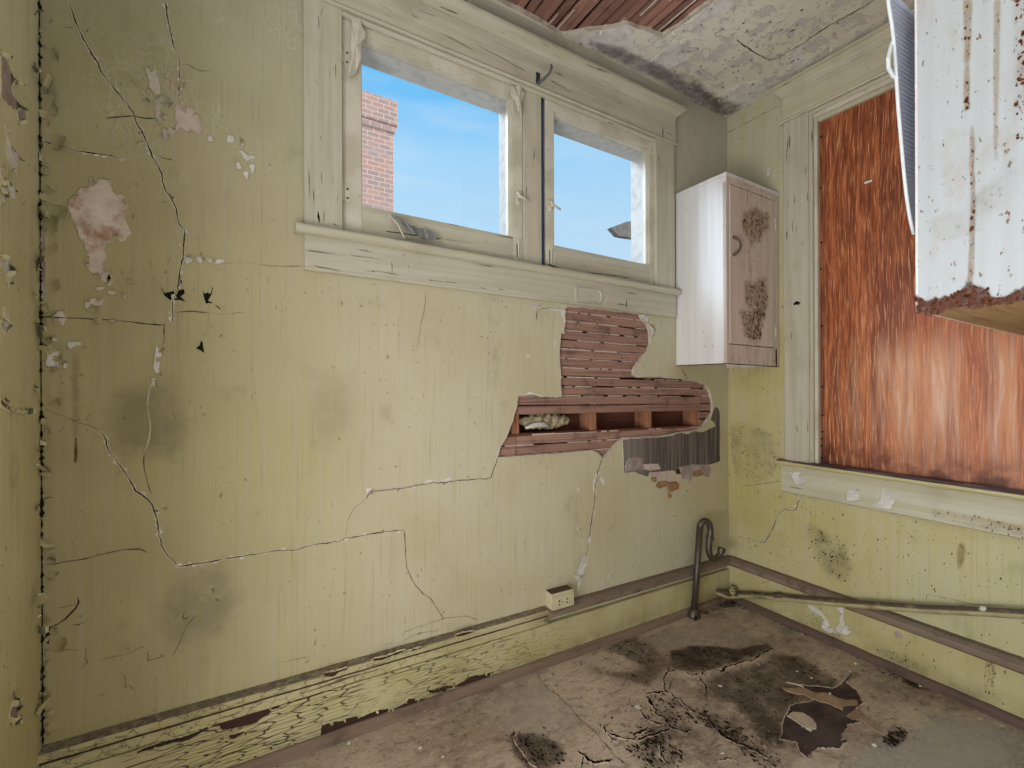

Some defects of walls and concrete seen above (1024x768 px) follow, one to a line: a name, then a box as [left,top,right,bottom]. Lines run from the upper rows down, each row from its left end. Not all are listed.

water stain [648,64,720,113]
crack [41,0,240,342]
peeling [0,0,136,745]
flaking render [497,303,721,498]
crack [48,379,499,645]
crack [579,458,618,579]
crack [738,496,802,544]
peeling [136,705,281,755]
peeling [319,671,495,736]
crack [577,647,774,768]
spalling [599,690,785,768]
water stain [604,637,835,741]